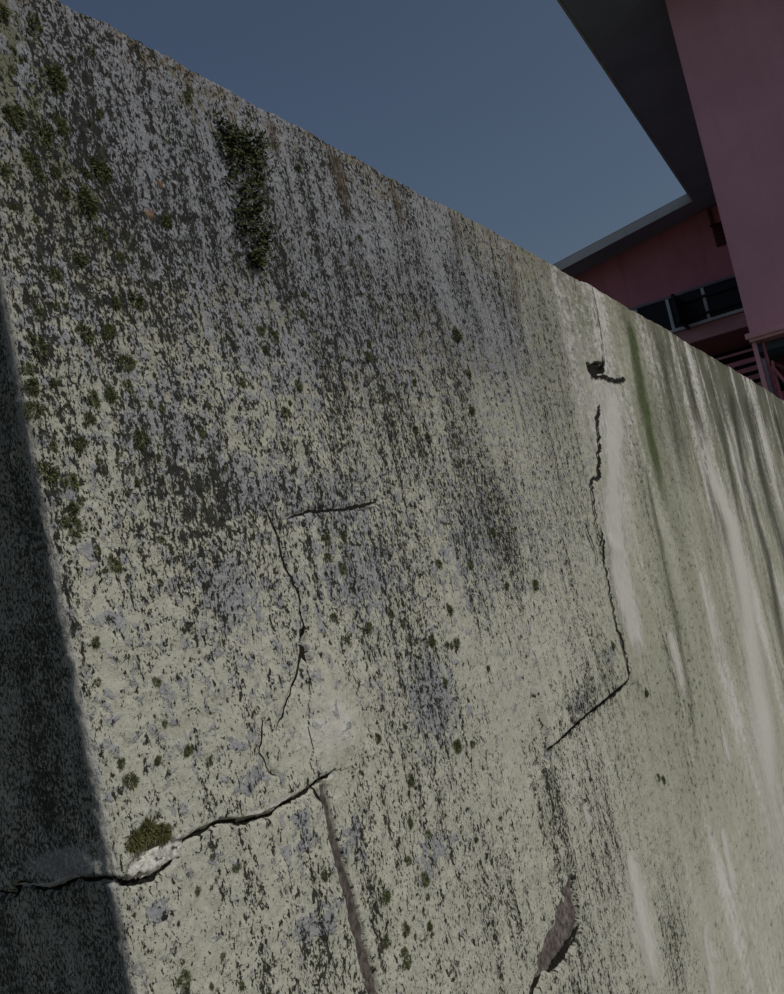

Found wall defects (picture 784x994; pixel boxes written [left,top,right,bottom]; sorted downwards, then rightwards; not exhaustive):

crack [586,284,625,383]
leakage [628,327,661,480]
crack [546,404,630,866]
leakage [669,616,684,689]
leakage [698,398,784,822]
crack [0,502,378,994]
spalling [529,874,582,994]
leakage [628,854,657,977]